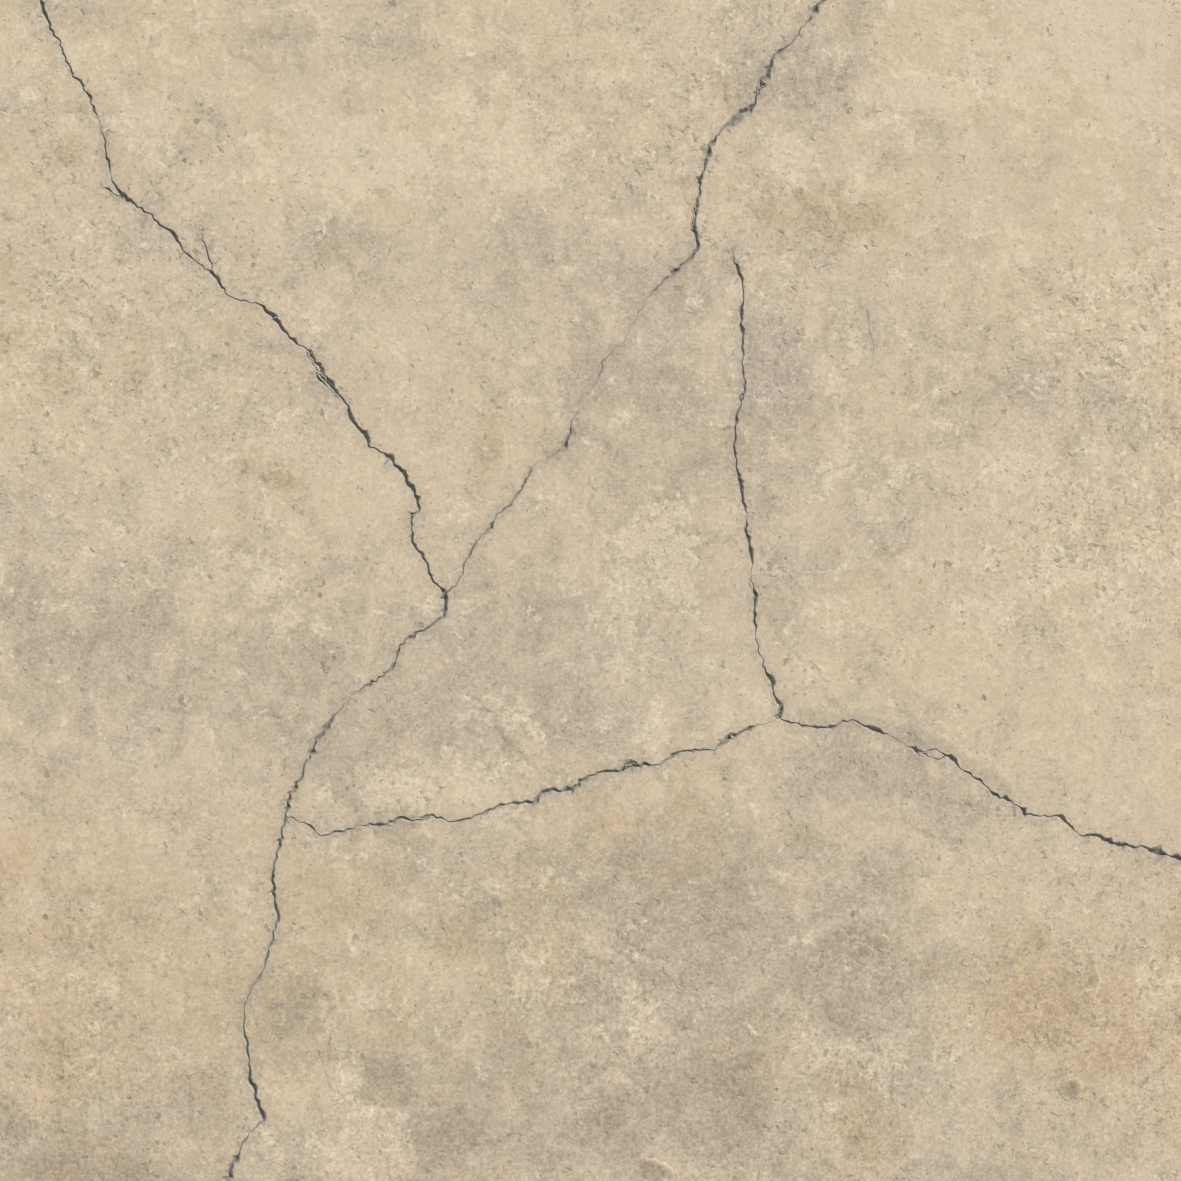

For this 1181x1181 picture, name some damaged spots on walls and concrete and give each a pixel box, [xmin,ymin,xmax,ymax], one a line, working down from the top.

crack [37,0,542,700]
crack [590,0,828,391]
crack [221,250,1181,1181]